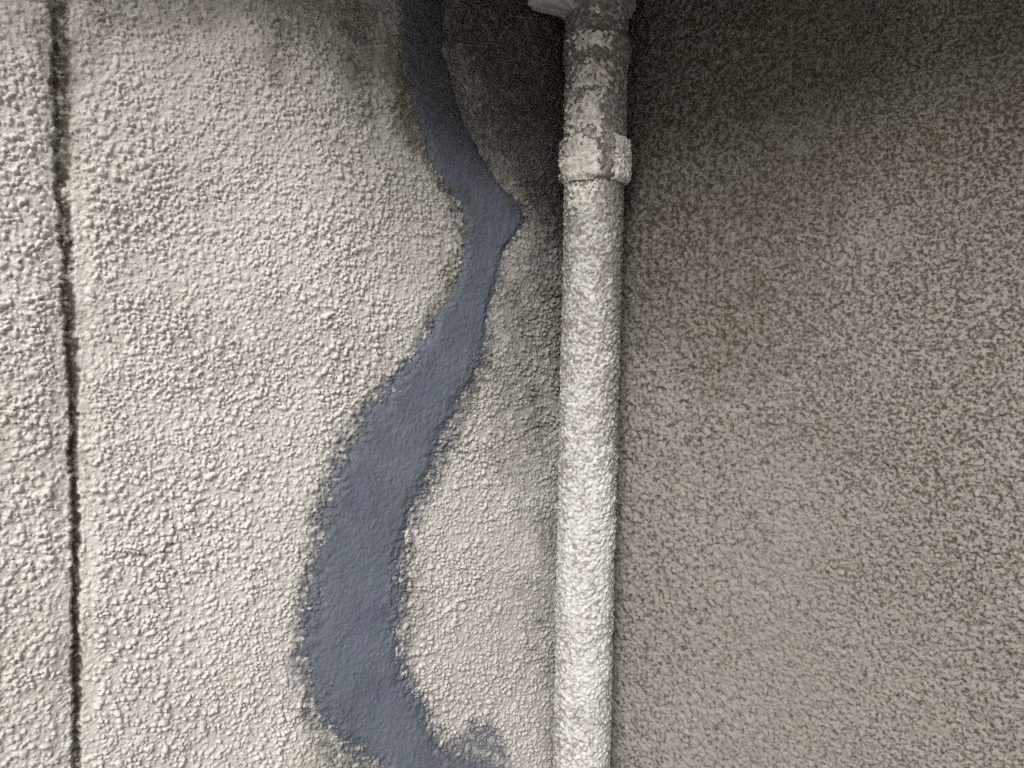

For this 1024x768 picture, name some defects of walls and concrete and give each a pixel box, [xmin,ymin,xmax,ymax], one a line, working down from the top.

leakage [457,0,566,229]